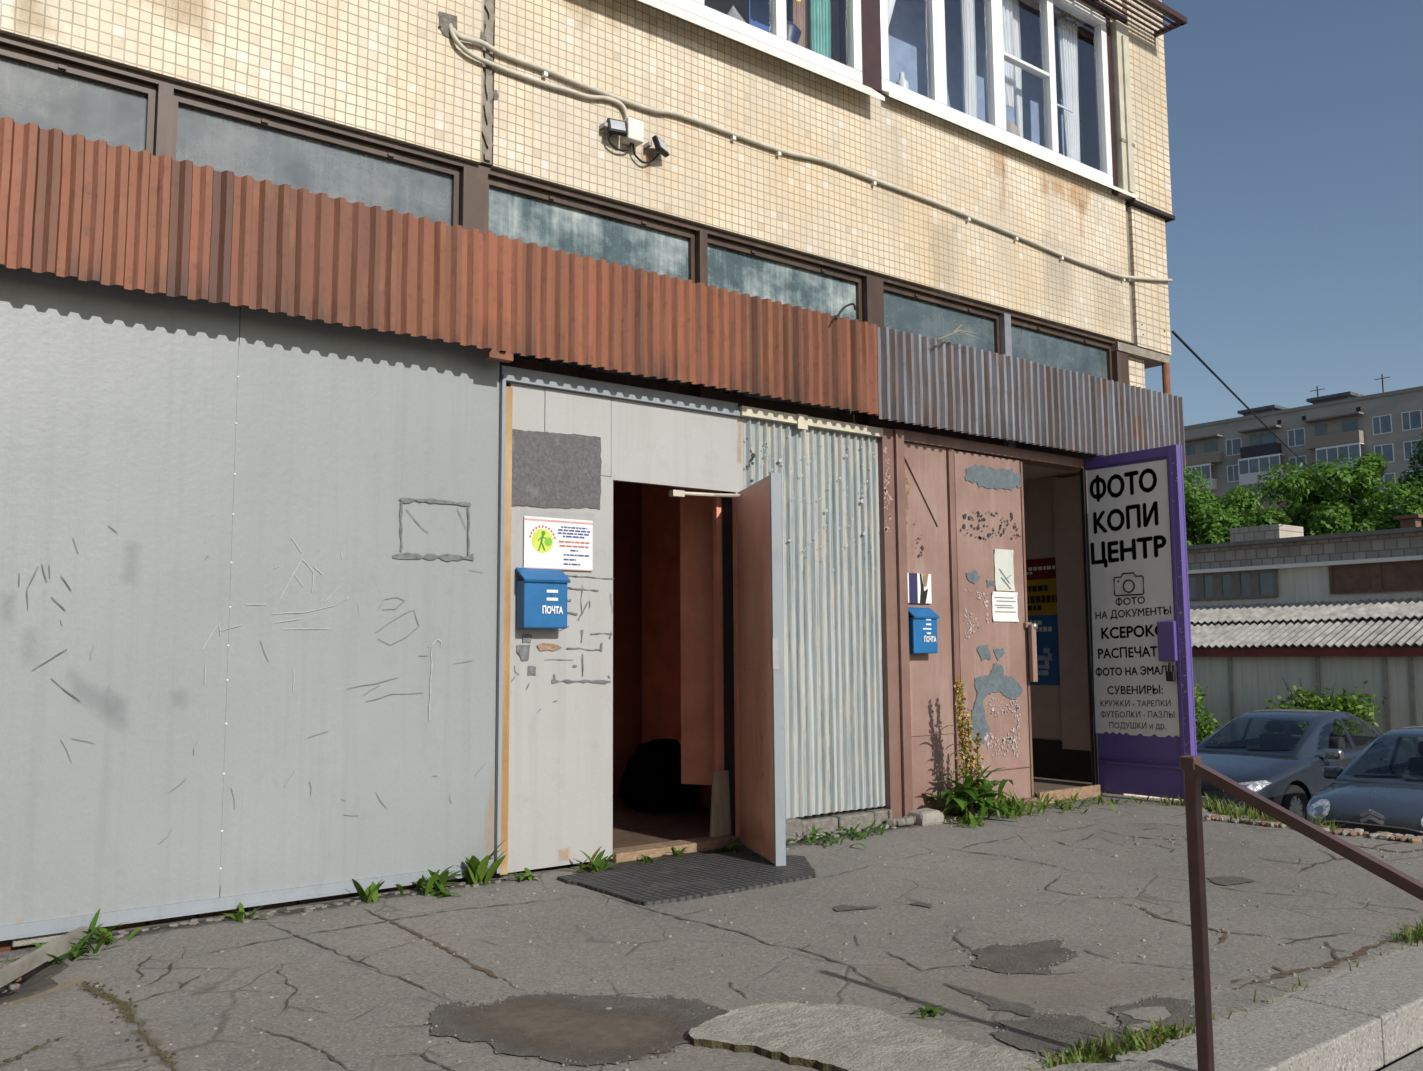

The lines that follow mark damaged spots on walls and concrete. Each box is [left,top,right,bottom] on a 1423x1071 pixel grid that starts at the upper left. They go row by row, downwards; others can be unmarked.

peeling [961,511,1021,540]
peeling [964,570,1022,757]
crack [126,894,974,1071]
crack [949,823,1423,990]